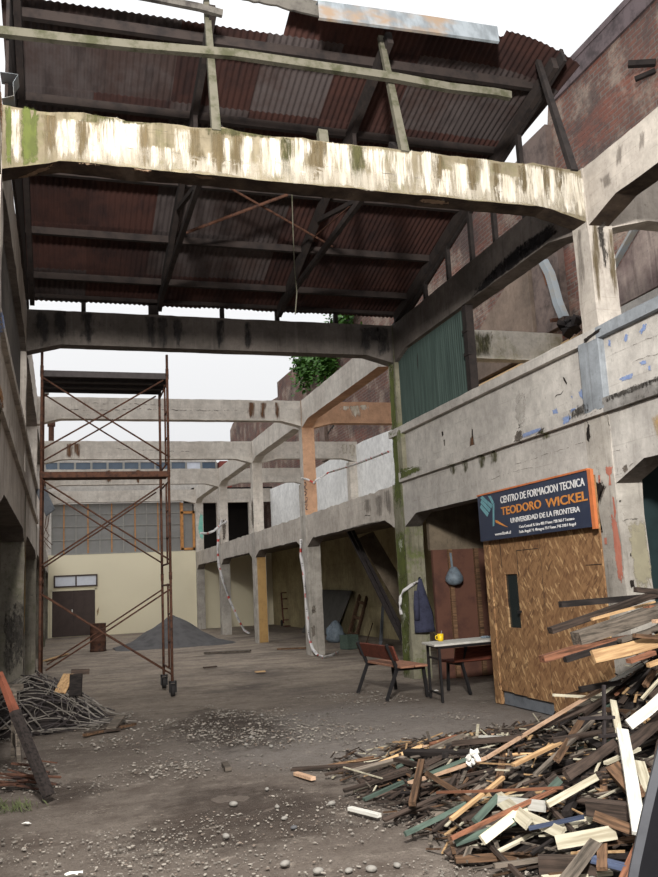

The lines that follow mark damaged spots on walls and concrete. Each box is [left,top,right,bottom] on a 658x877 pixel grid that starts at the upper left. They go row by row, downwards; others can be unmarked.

leakage [11,109,20,160]
leakage [45,115,586,216]
leakage [578,222,616,300]
leakage [36,311,66,341]
leakage [82,313,93,341]
leakage [146,317,182,348]
rust [249,402,279,418]
peeling [596,465,635,588]